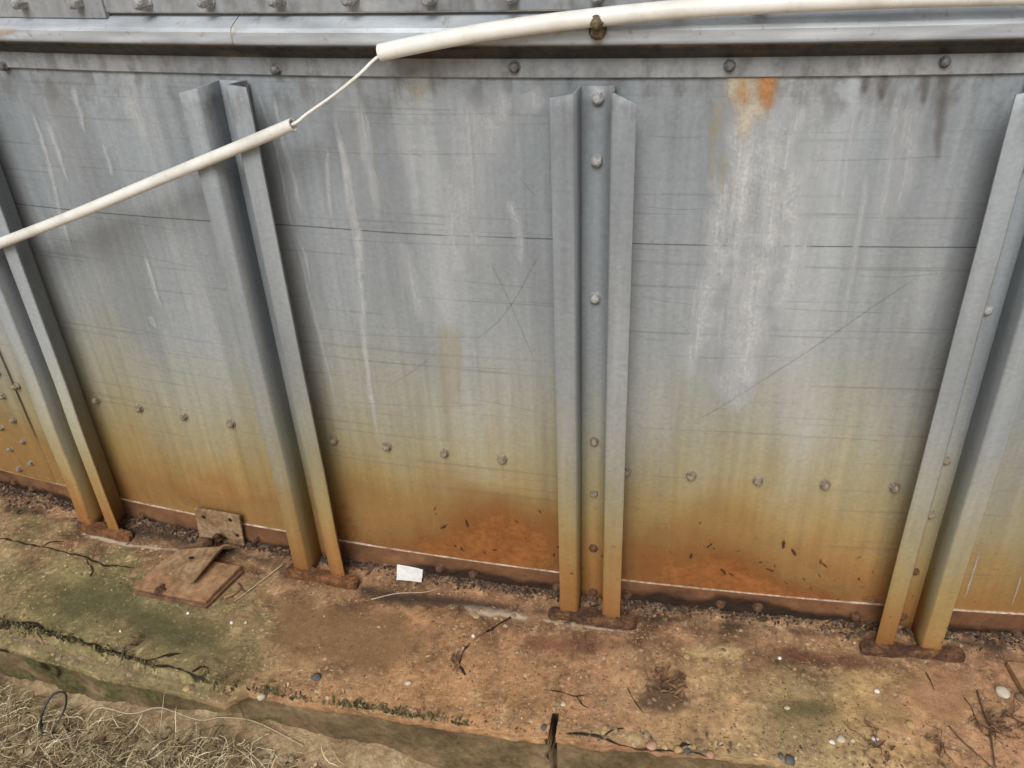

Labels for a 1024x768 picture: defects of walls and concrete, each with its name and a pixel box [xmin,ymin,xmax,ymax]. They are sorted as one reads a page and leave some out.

corrosion [729,77,774,132]
leakage [720,114,793,403]
corrosion [76,521,134,542]
corrosion [355,490,554,570]
corrosion [640,510,843,601]
corrosion [548,606,637,630]
corrosion [859,639,966,663]